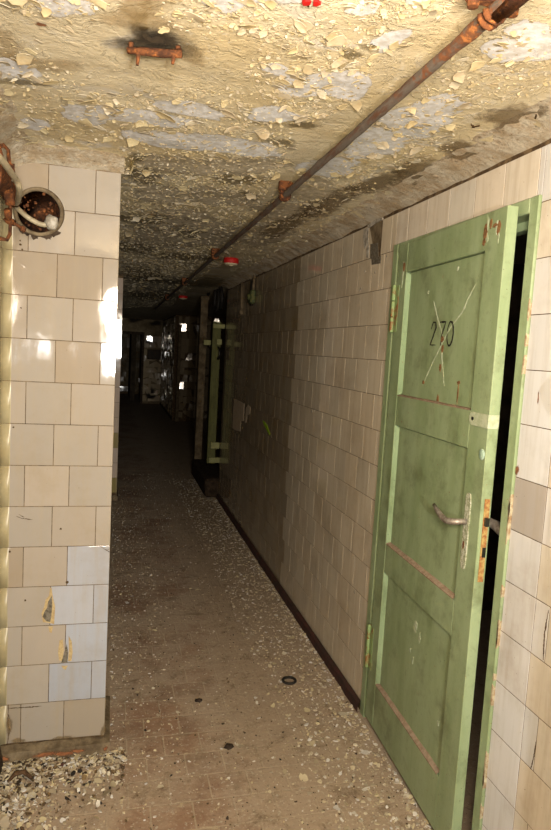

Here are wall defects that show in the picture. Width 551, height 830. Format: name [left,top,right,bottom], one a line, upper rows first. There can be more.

peeling [0,0,551,308]
spalling [41,588,55,633]
spalling [58,637,73,670]